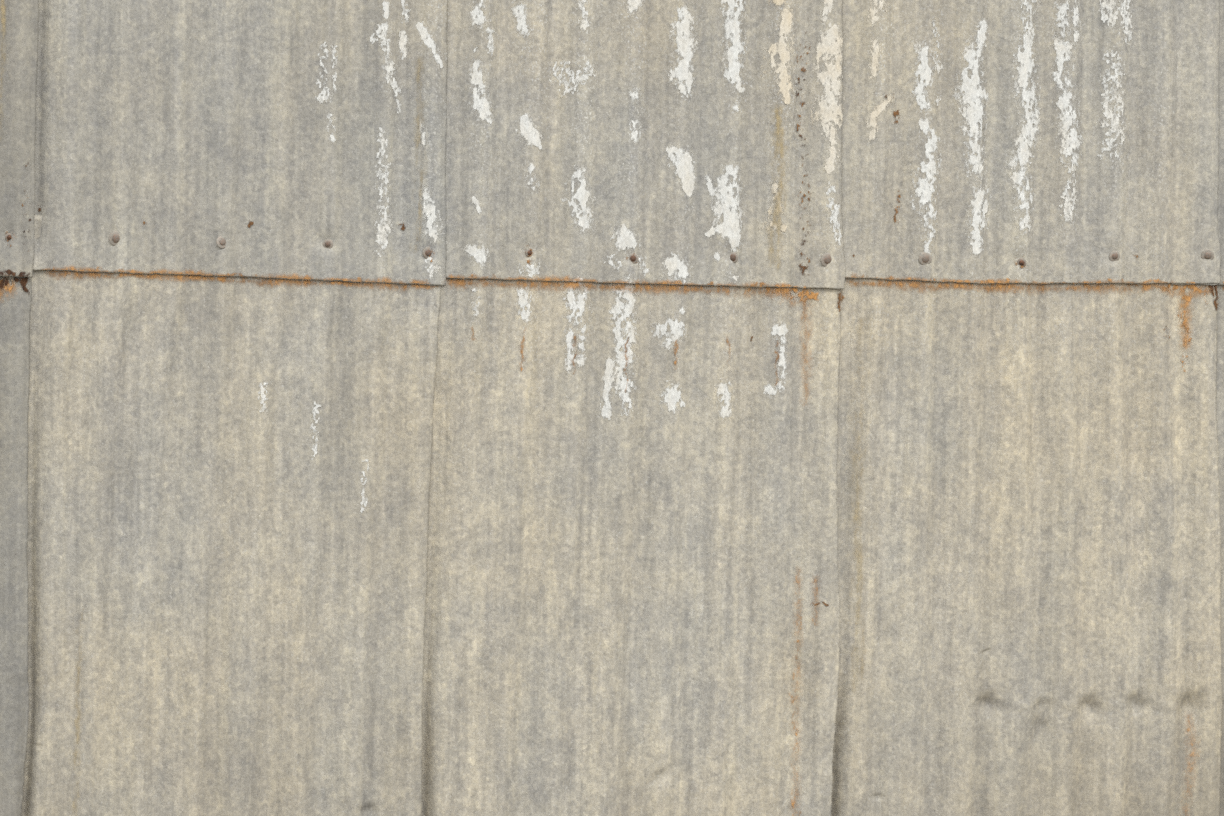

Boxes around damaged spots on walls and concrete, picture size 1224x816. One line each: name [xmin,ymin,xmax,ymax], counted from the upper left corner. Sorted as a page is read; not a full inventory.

peeling [370,0,443,113]
peeling [720,0,747,111]
peeling [810,0,845,245]
peeling [910,20,991,255]
peeling [1006,0,1041,231]
peeling [1053,0,1082,222]
peeling [666,145,743,261]
corrosion [0,267,430,294]
corrosion [450,274,731,293]
peeling [600,223,689,420]
corrosion [745,228,818,302]
corrosion [854,263,1053,292]